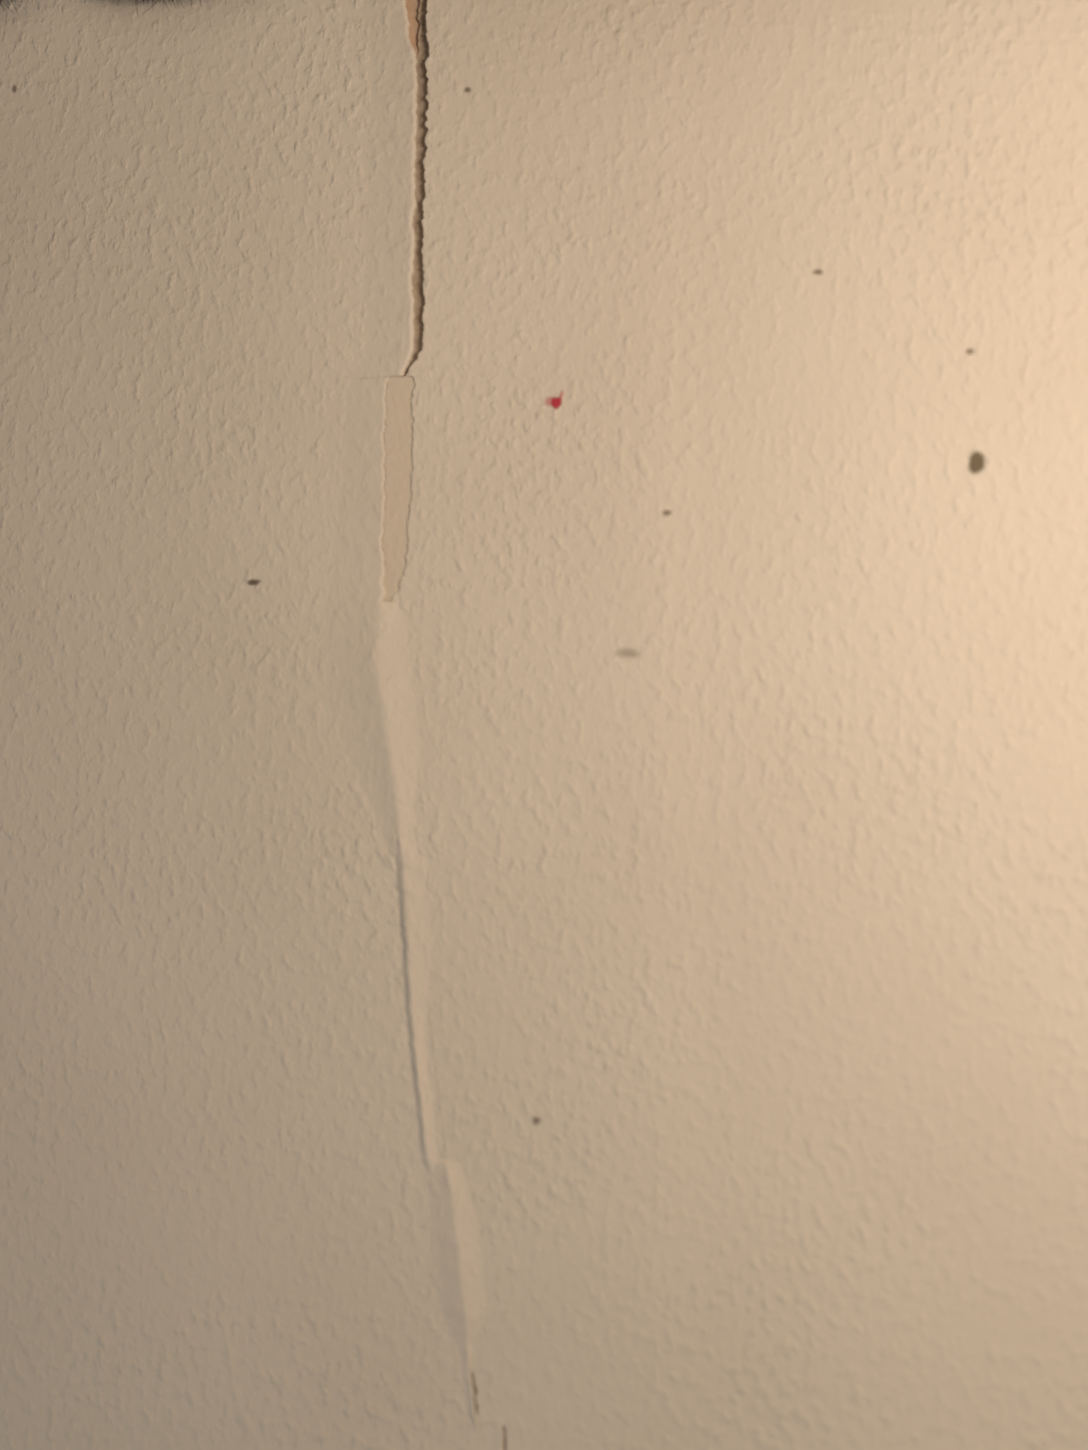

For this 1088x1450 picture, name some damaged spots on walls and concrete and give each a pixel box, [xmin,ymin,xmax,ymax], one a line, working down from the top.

peeling [382,377,416,602]
crack [321,0,506,1450]